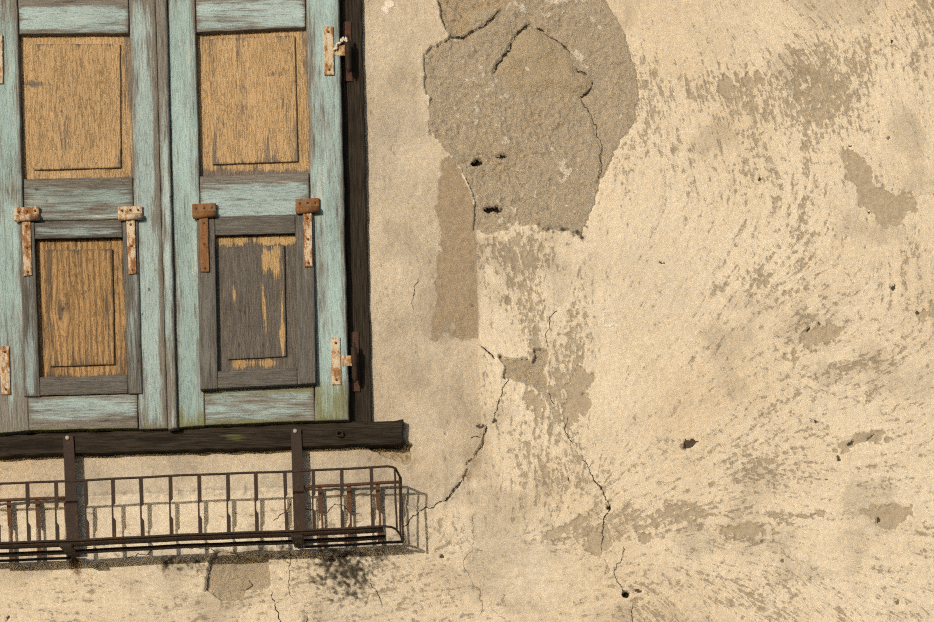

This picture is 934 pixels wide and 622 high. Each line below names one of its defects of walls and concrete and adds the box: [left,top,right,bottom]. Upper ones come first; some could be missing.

spalling [424,0,639,236]
flaking render [841,145,922,229]
crack [403,379,509,527]
crack [549,393,633,622]
spalling [205,551,271,601]
damp [307,546,388,602]
crack [463,514,506,621]